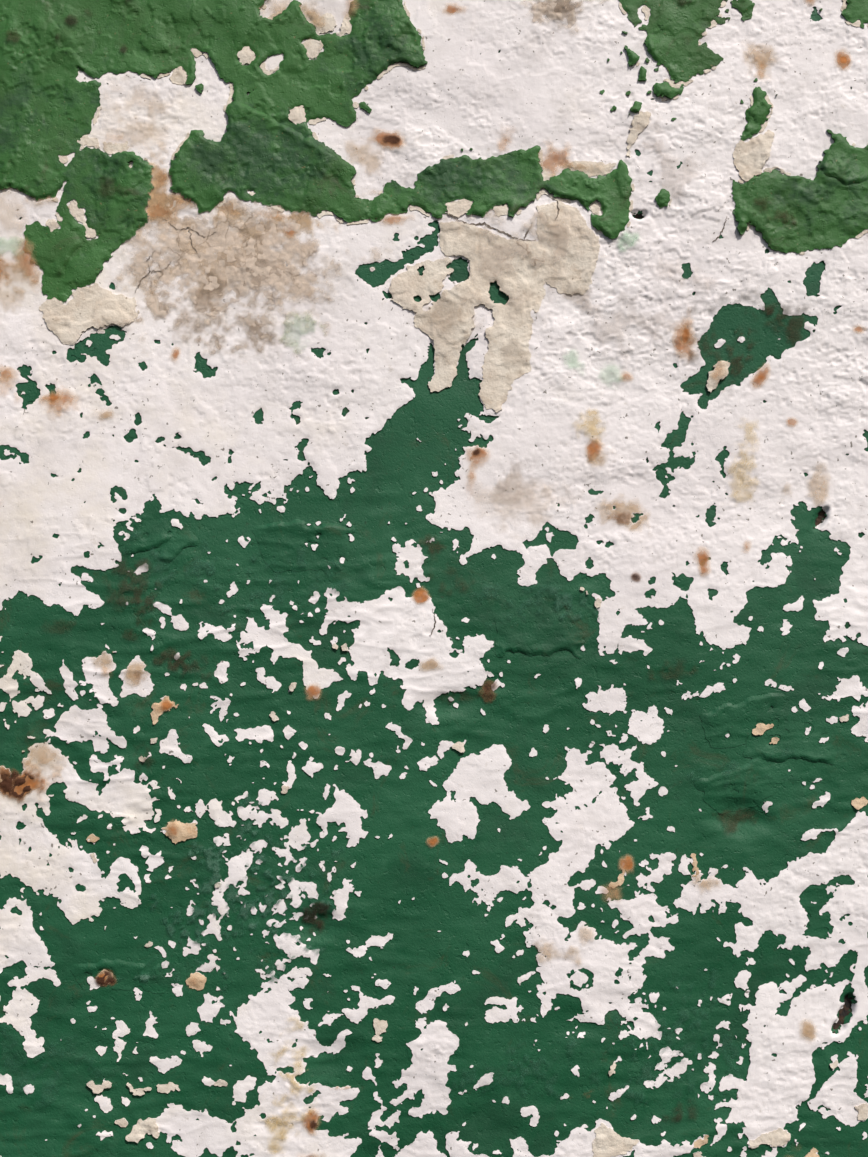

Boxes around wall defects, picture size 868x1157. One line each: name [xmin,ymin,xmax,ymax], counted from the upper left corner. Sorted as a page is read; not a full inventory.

rust [375,132,402,148]
rust [0,240,37,283]
peeling [0,0,868,725]
rust [0,747,56,800]
peeling [0,636,868,1157]
rust [96,971,116,985]